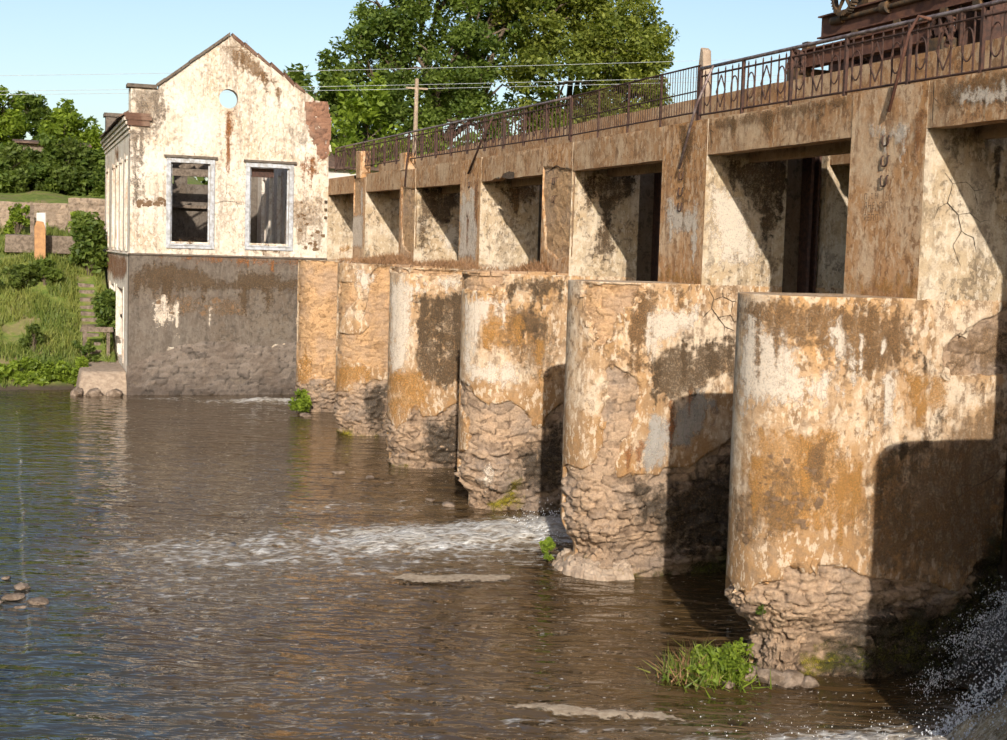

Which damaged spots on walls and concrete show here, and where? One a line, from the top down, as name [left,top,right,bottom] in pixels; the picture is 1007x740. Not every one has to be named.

rust [226,109,235,173]
spalling [305,100,332,162]
peeling [136,197,166,208]
spalling [353,180,361,214]
water stain [130,261,298,327]
water stain [357,270,375,291]
water stain [336,277,567,435]
spalling [127,201,832,577]
spalling [941,308,1007,381]
water stain [623,290,1007,680]
spalling [724,558,998,679]